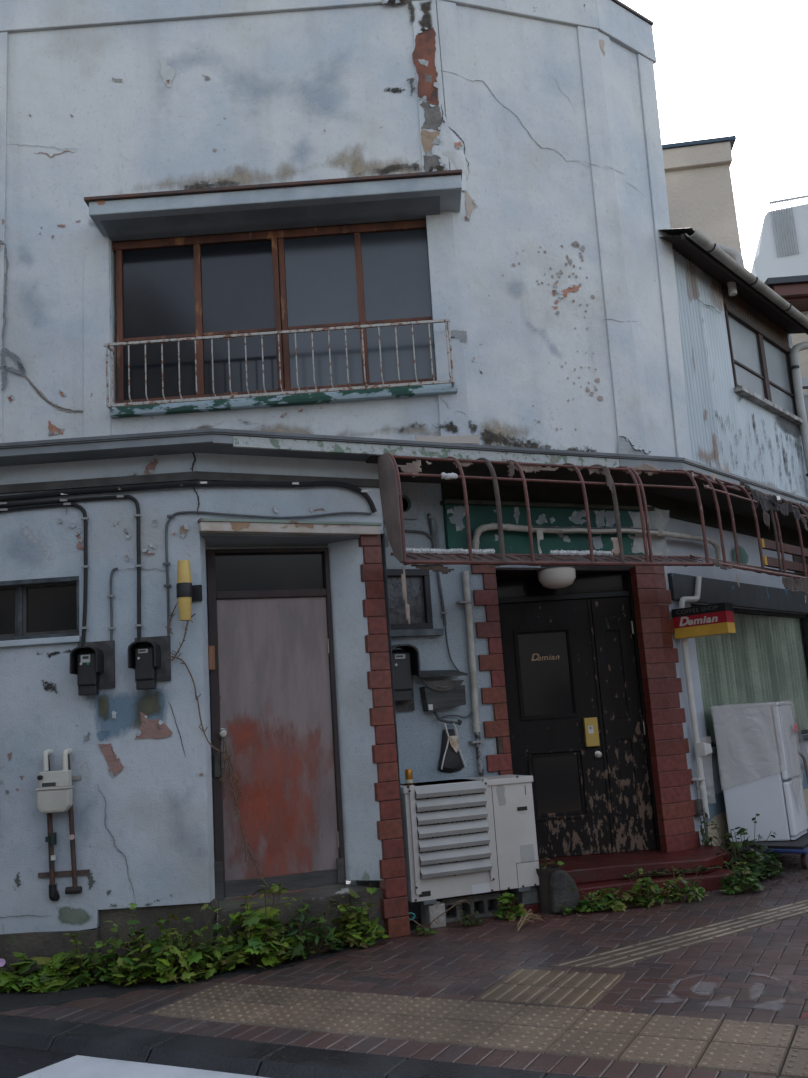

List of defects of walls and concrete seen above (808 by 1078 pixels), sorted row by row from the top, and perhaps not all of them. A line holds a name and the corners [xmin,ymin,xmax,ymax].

water stain [184,168,265,190]
water stain [333,151,447,176]
spalling [412,27,443,172]
peeling [464,192,478,221]
crack [440,70,639,191]
crack [0,240,83,412]
spalling [537,241,595,330]
water stain [399,420,551,449]
peeling [707,410,807,492]
peeling [76,725,124,777]
peeling [134,712,172,740]
crack [97,782,135,898]